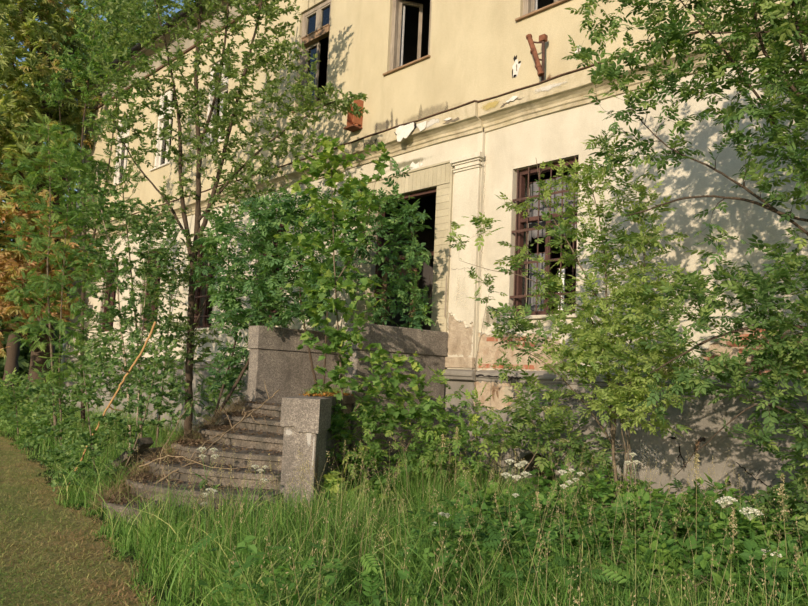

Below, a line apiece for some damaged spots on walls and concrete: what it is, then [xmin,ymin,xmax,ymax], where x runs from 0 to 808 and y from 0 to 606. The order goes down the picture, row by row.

spalling [512,55,521,78]
flaking render [394,121,427,142]
flaking render [444,276,578,371]
flaking render [471,381,524,413]
crack [736,462,775,487]